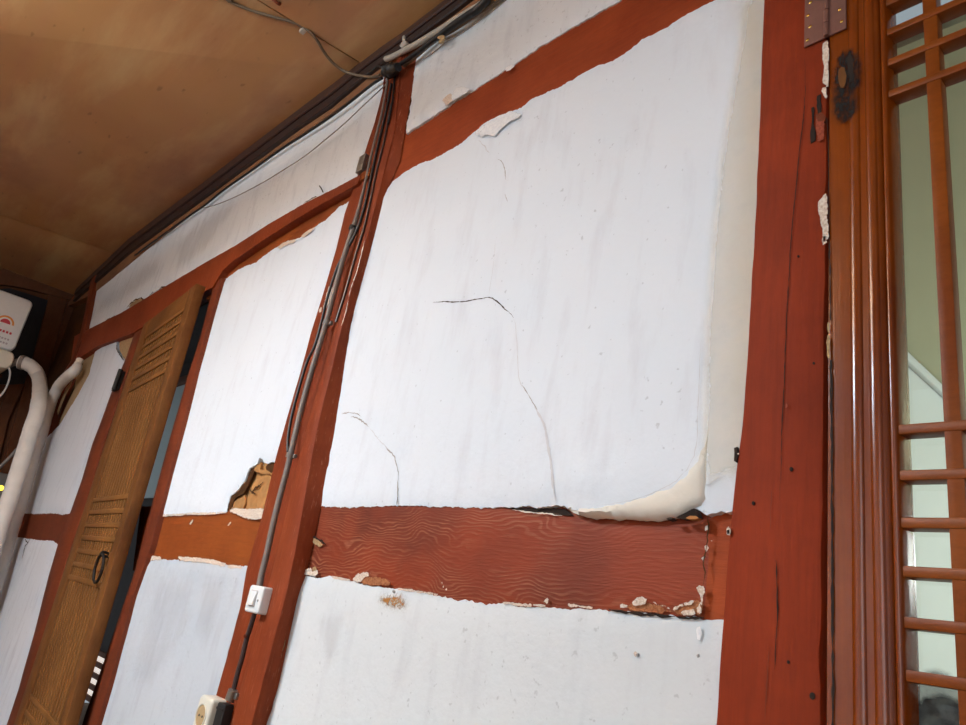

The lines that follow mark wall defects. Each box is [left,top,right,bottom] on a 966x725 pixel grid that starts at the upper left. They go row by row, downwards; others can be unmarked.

spalling [475,111,522,153]
spalling [810,94,828,144]
crack [442,253,556,501]
crack [343,412,399,503]
spalling [163,462,274,520]
spalling [353,572,390,586]
spalling [609,585,705,640]